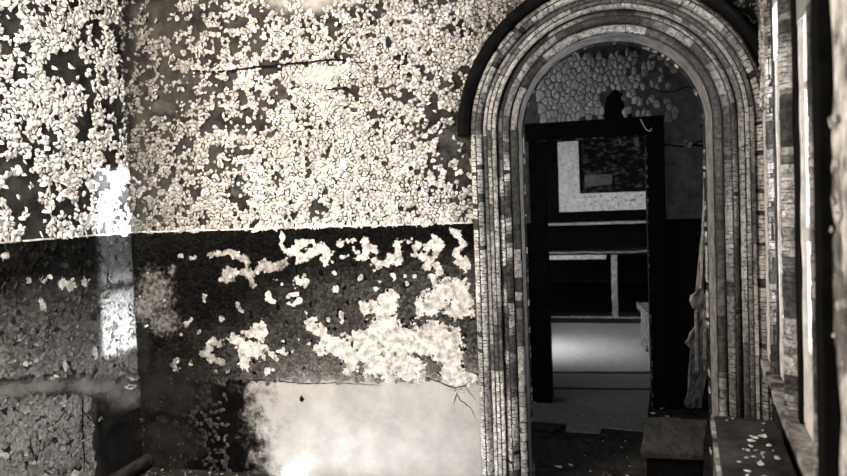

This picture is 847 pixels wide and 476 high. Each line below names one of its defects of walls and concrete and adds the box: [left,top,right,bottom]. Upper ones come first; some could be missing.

crack [0,221,479,476]
flaking render [0,0,525,476]
crack [190,59,370,79]
spalling [522,41,713,476]
crack [664,140,703,148]